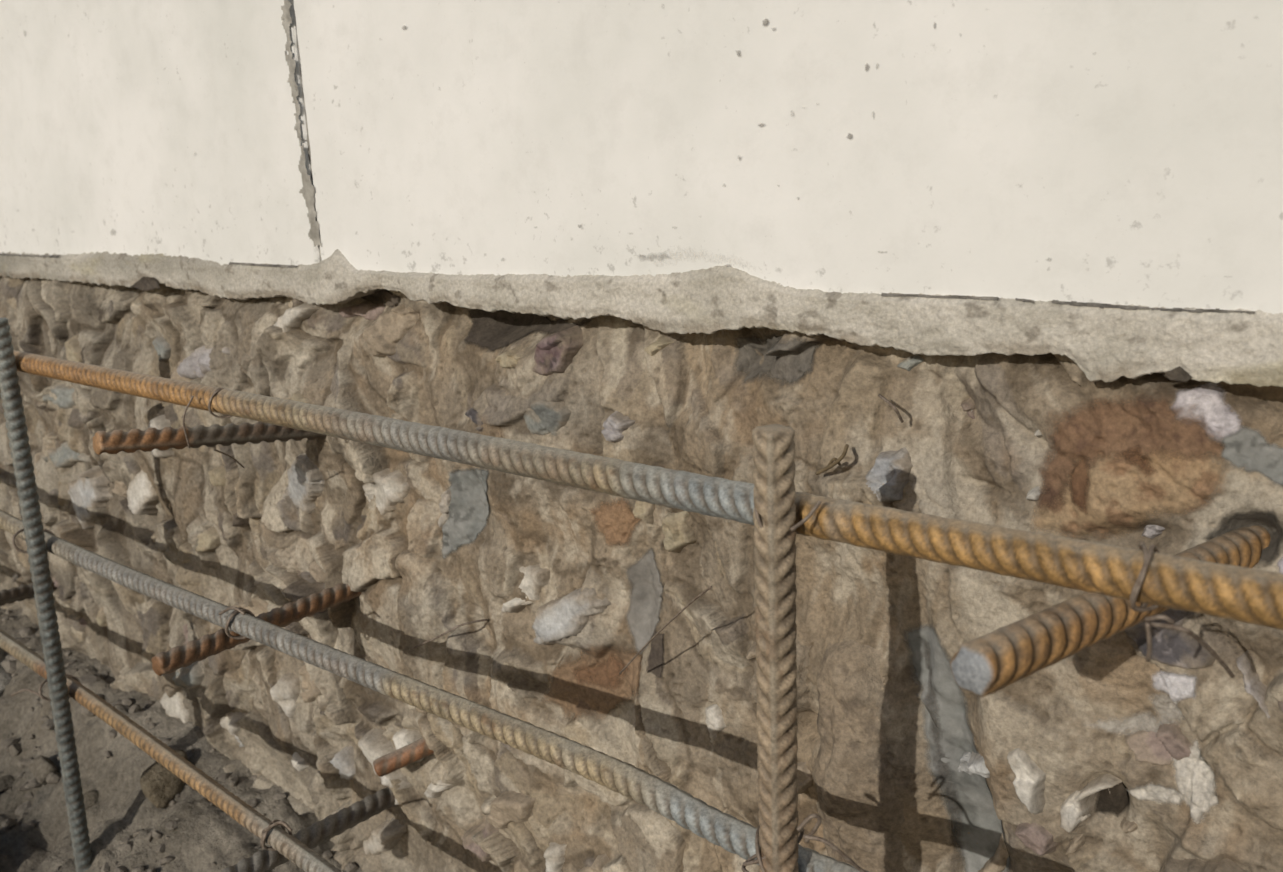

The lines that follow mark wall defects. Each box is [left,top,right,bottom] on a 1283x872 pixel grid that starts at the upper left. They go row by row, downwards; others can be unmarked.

spalling [131,276,160,291]
spalling [361,289,419,357]
spalling [464,309,591,351]
corrosion [1033,395,1224,536]
spalling [0,318,1283,872]